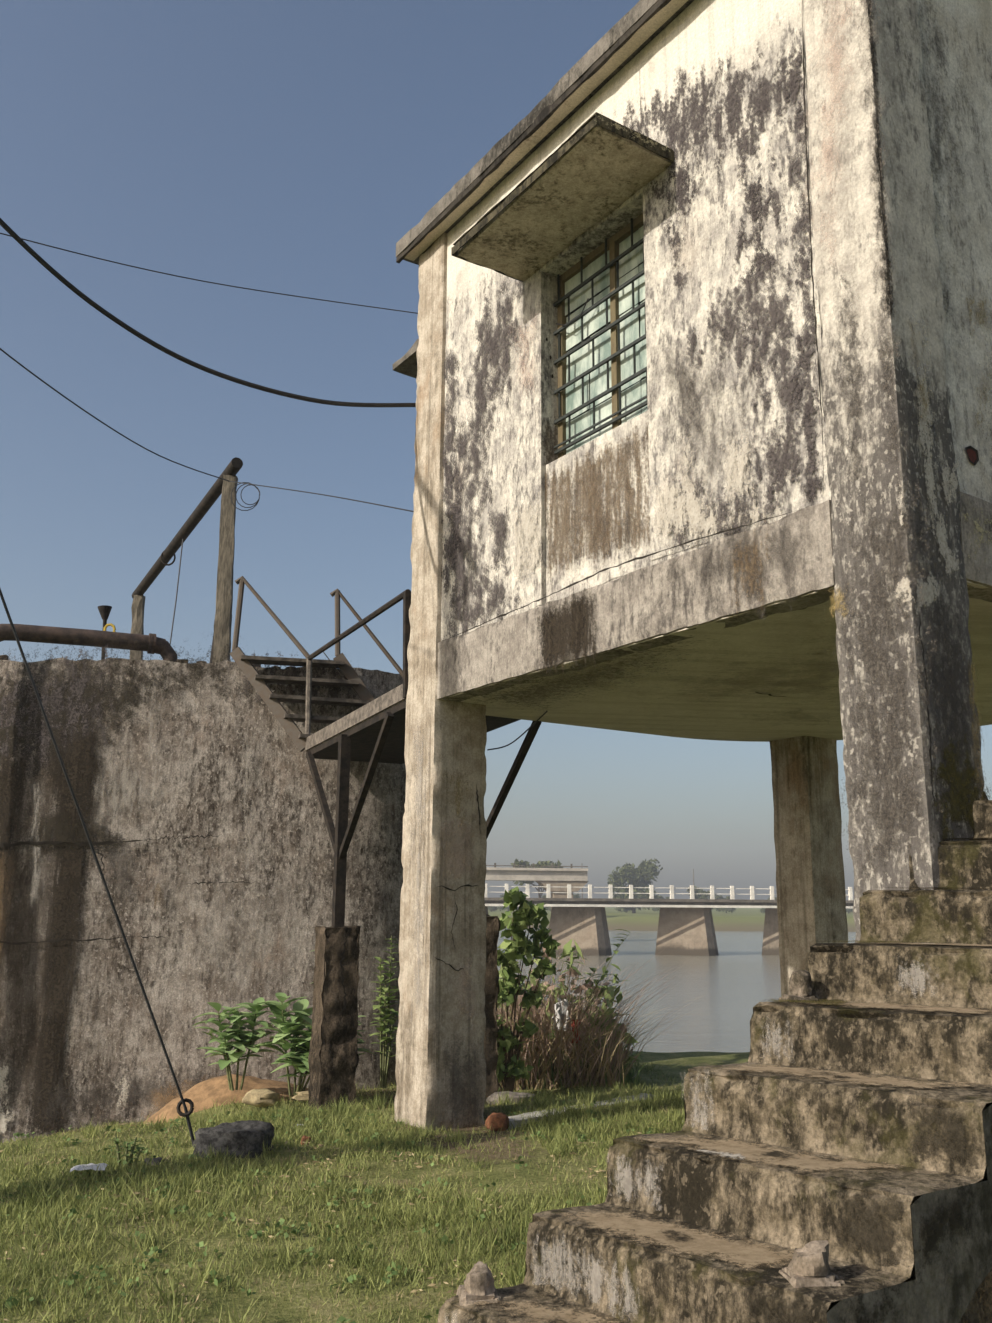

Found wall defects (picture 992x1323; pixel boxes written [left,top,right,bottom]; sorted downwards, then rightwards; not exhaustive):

water stain [667,162,691,290]
water stain [738,157,768,283]
water stain [782,46,823,504]
water stain [861,0,899,407]
water stain [684,327,702,436]
water stain [441,350,459,592]
water stain [488,503,509,573]
water stain [545,426,650,582]
water stain [667,464,794,591]
water stain [451,583,704,709]
water stain [0,646,201,1136]
crack [433,884,478,973]